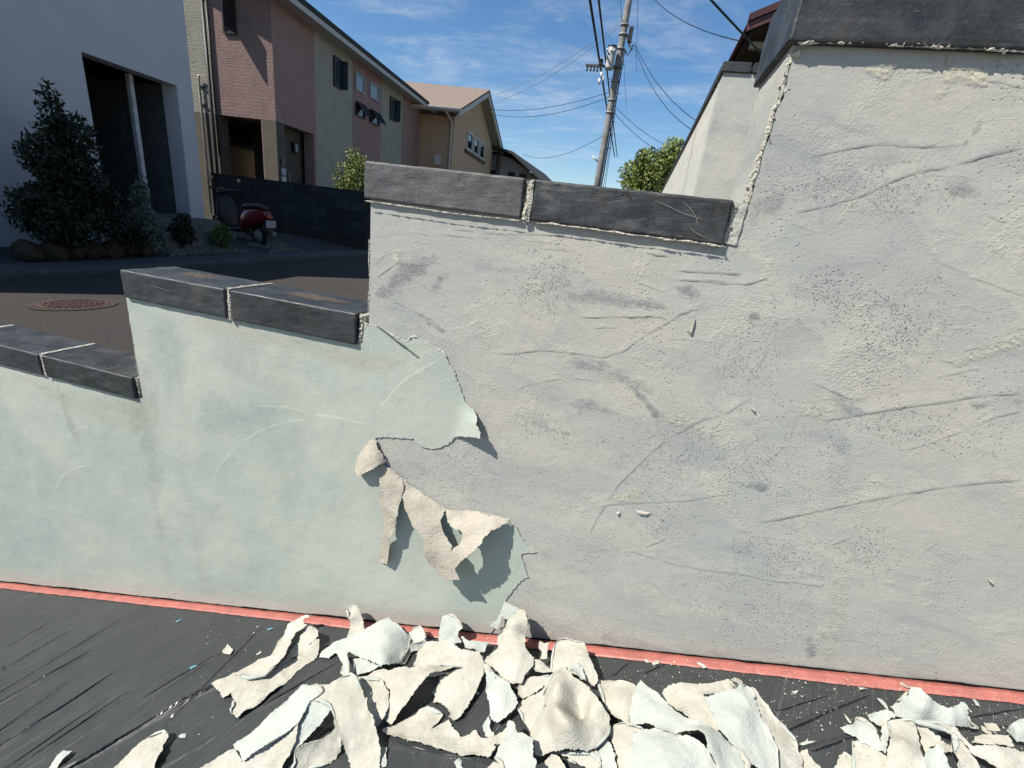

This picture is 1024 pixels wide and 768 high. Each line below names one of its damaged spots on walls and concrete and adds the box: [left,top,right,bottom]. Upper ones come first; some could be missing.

peeling [0,291,821,768]